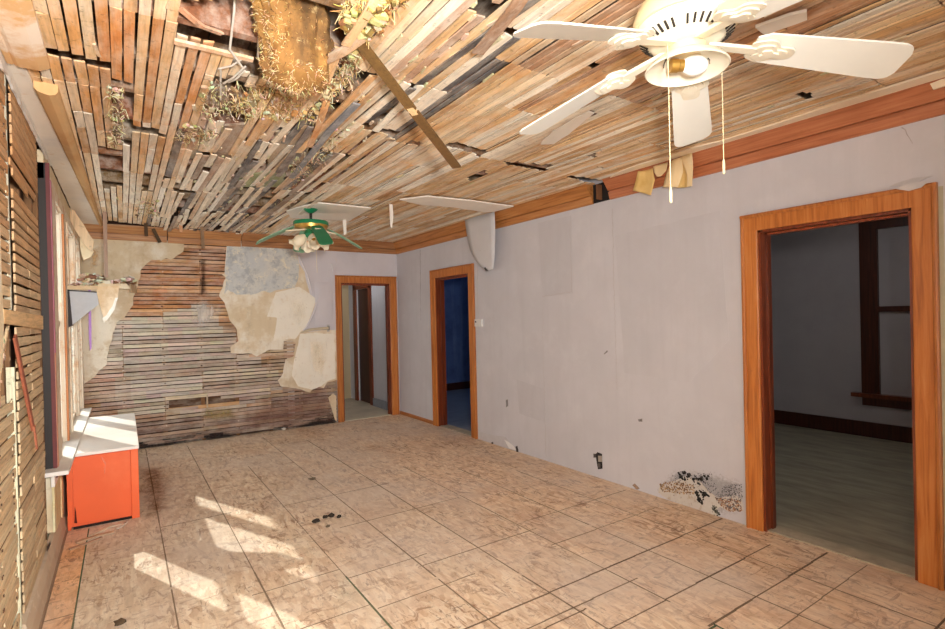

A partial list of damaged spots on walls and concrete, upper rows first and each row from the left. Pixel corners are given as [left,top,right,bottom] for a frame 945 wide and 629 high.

flaking render [168,394,240,410]
flaking render [328,394,337,421]